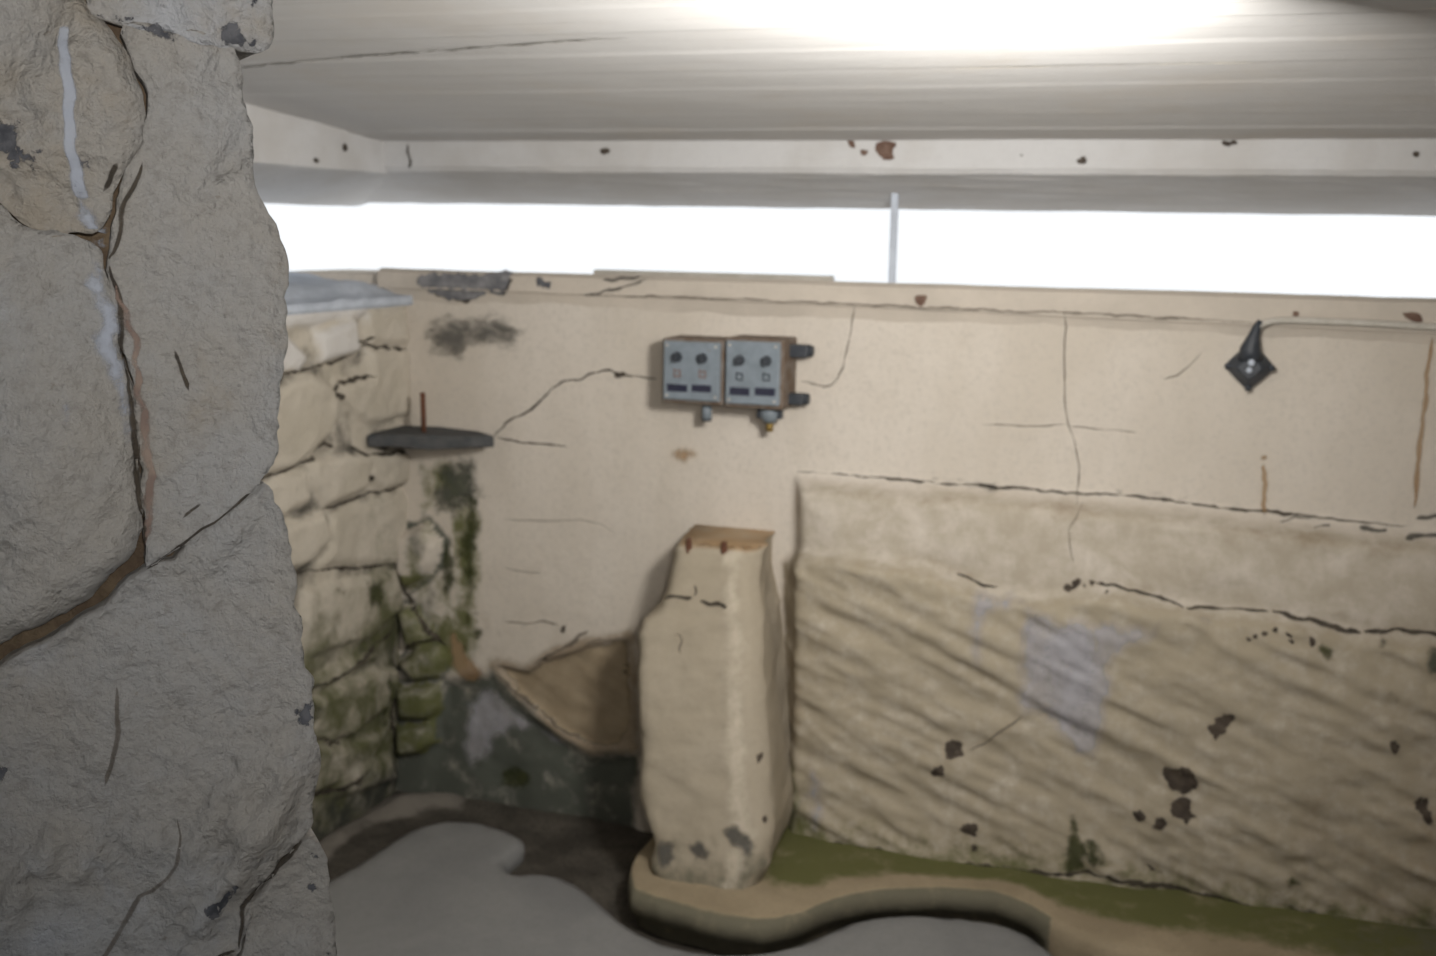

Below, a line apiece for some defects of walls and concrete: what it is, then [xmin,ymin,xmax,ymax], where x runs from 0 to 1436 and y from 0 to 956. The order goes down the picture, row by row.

water stain [431,321,515,355]
corrosion [1403,312,1423,322]
crack [494,369,656,447]
corrosion [1414,339,1433,507]
crack [583,276,1436,637]
water stain [434,462,475,510]
water stain [1428,648,1436,672]
efflorescence [469,692,526,756]
peeling [1207,714,1235,740]
peeling [1133,767,1198,830]
peeling [1414,797,1433,825]